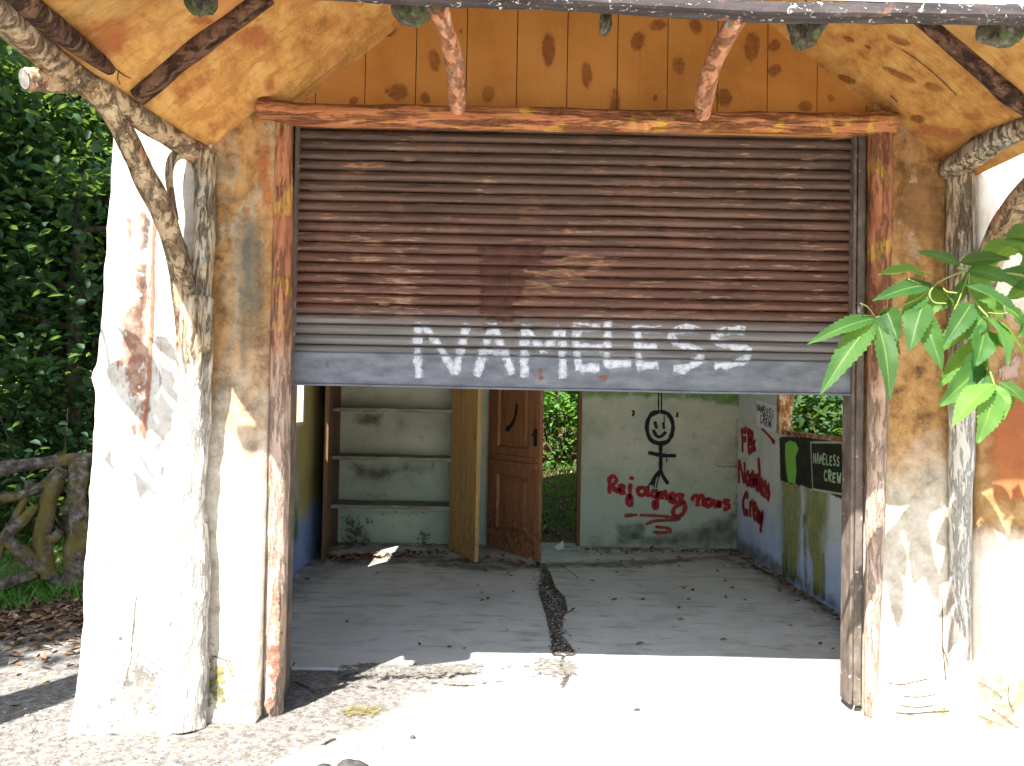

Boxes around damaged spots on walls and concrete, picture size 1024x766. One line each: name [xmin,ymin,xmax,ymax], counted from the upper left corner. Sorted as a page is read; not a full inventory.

peeling [117,263,151,437]
peeling [126,209,149,250]
rust [478,245,545,331]
crack [530,561,597,685]